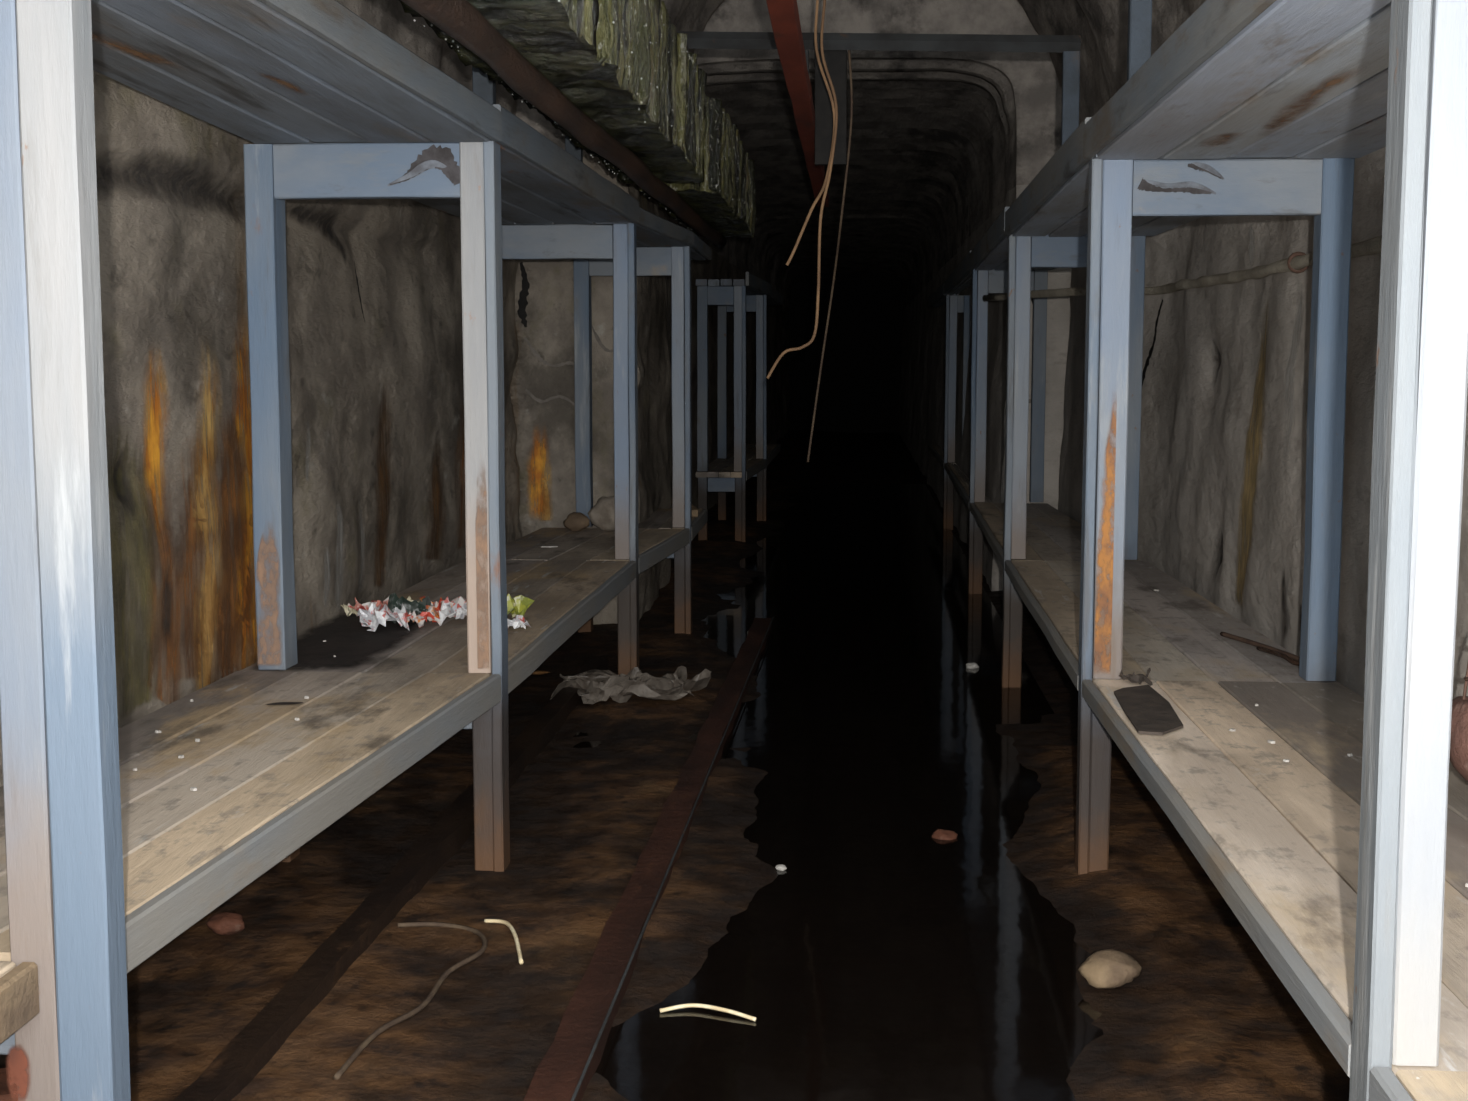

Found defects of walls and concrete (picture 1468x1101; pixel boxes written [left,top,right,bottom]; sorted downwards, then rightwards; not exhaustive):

rust [146,348,281,703]
rust [530,439,551,520]
rust [1094,412,1116,671]